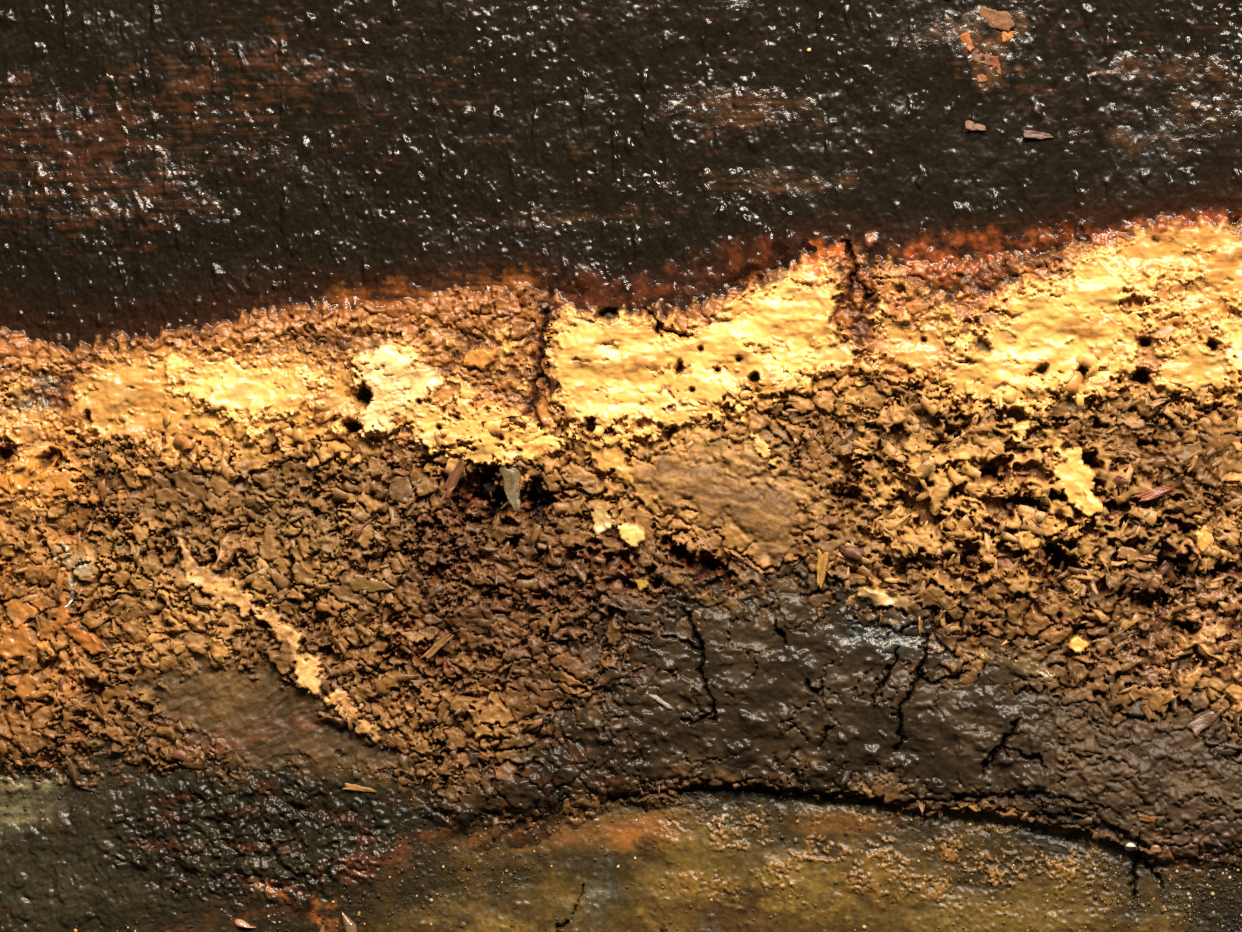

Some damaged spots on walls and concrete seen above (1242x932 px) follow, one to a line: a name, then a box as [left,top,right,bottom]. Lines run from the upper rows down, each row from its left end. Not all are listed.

peeling [959,6,1015,84]
peeling [965,120,987,131]
rust [207,202,1242,350]
crack [839,239,877,313]
crack [678,607,717,727]
crack [773,619,787,646]
crack [804,679,836,742]
crack [871,633,971,752]